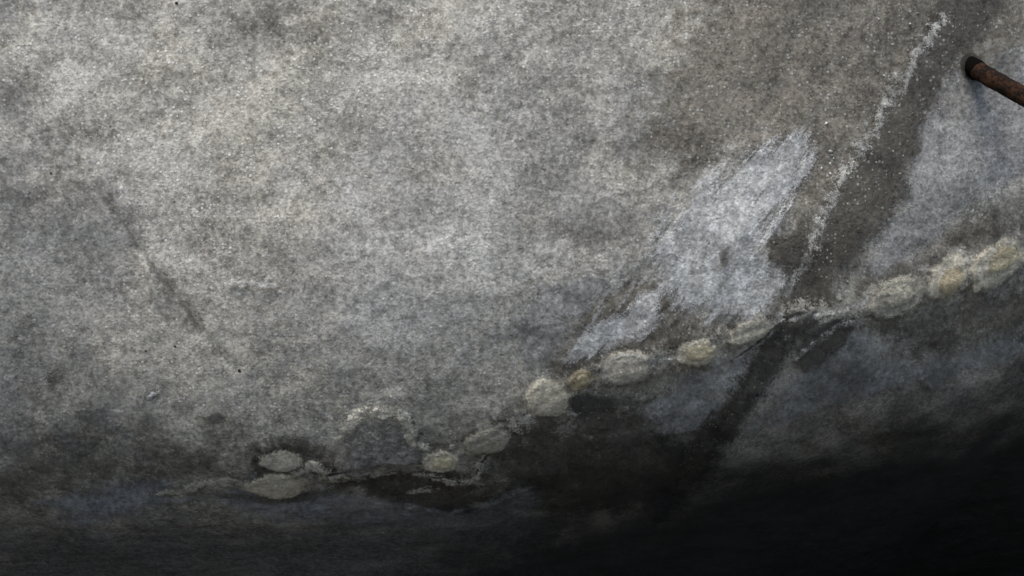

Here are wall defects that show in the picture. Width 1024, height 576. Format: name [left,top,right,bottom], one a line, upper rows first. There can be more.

damp [550,178,644,254]
damp [0,413,221,524]